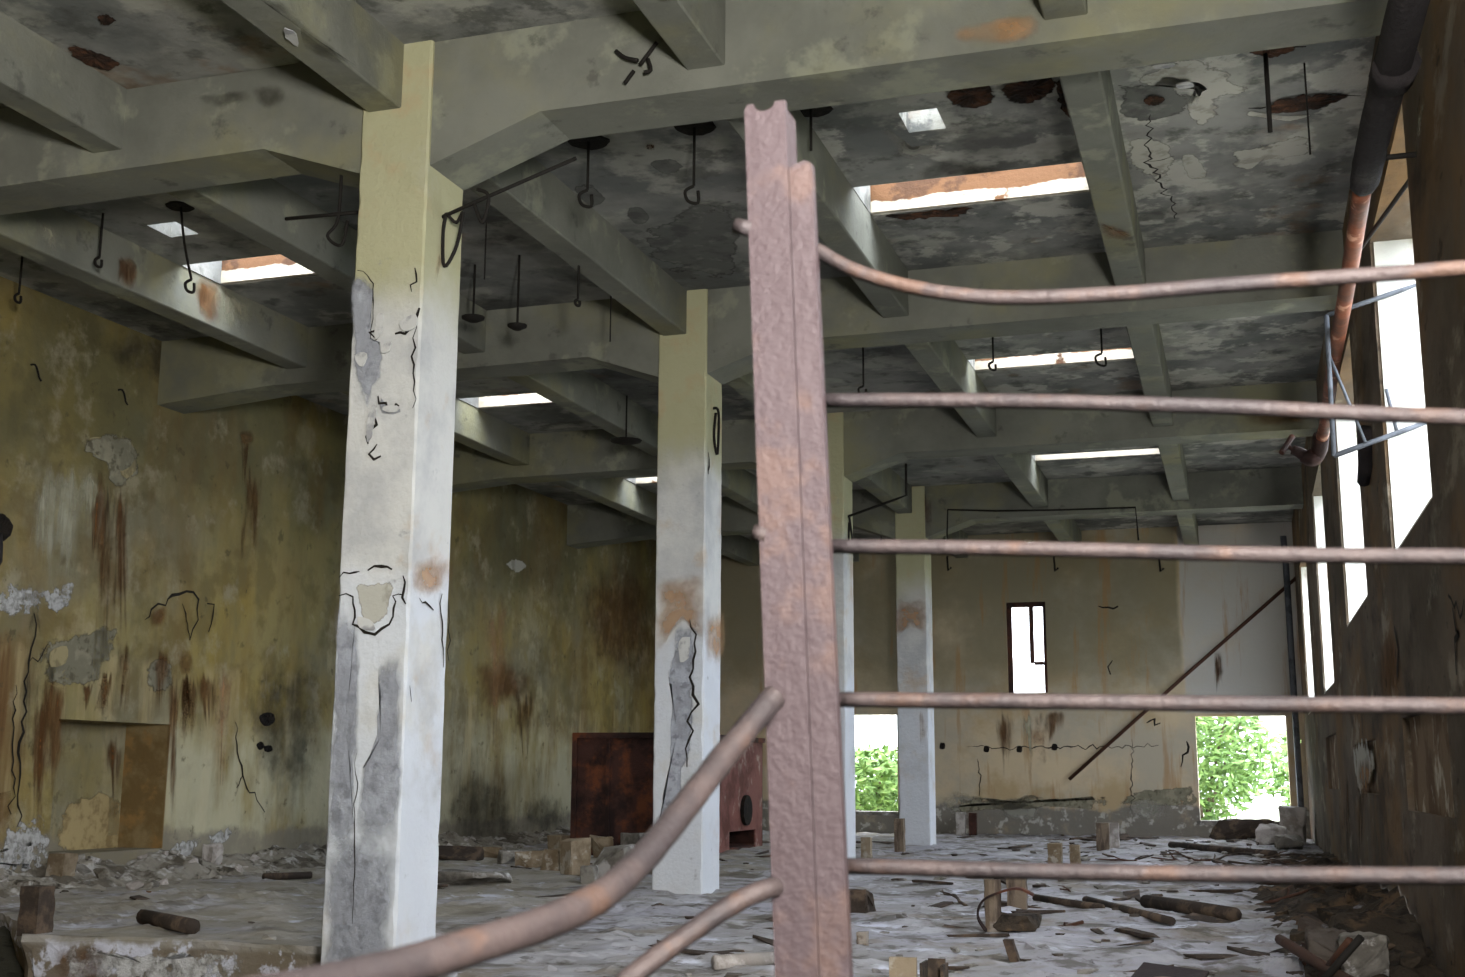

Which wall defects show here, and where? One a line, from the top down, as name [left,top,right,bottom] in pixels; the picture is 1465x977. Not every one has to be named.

spalling [947,78,1070,118]
crack [1143,115,1177,219]
peeling [1119,60,1359,180]
flaking render [352,268,420,461]
damp [0,583,74,615]
flaking render [41,626,117,685]
corrosion [92,486,125,602]
corrosion [662,587,721,656]
crack [7,613,48,827]
corrosion [34,674,63,787]
flaking render [327,583,402,962]
flaking render [660,619,700,815]